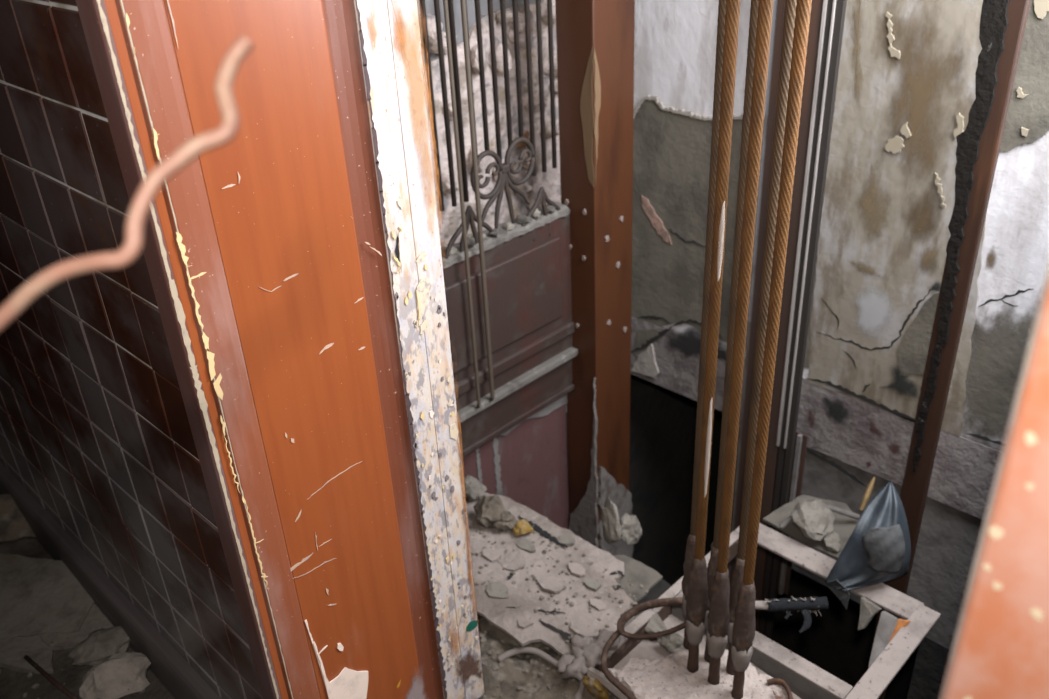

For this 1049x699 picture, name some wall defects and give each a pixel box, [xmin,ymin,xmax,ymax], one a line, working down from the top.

peeling [96,0,146,181]
spalling [120,0,161,162]
corrosion [396,19,439,194]
leakage [853,0,861,94]
leakage [893,29,962,170]
leakage [911,195,935,235]
leakage [921,249,941,291]
peeling [355,0,479,699]
crack [809,289,933,421]
peeling [150,182,293,699]
crack [966,433,1004,446]
peeling [305,620,368,699]